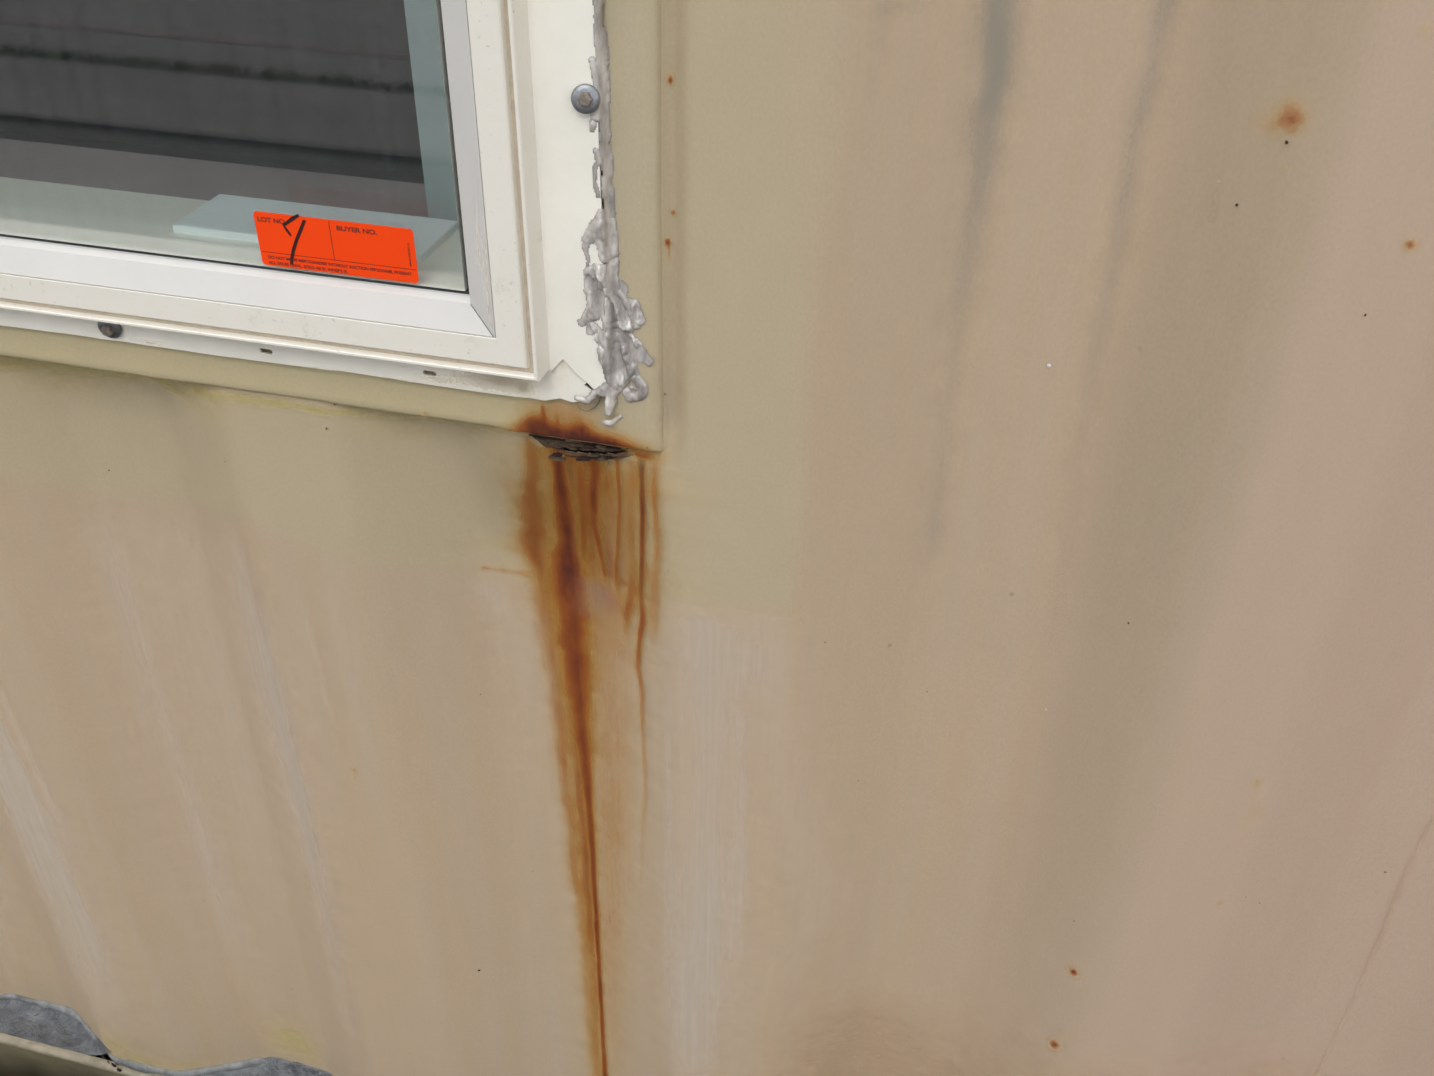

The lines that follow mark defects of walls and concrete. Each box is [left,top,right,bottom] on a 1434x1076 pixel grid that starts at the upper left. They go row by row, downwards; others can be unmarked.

leakage [968,0,1017,230]
corrosion [1277,105,1304,132]
corrosion [513,405,659,1076]